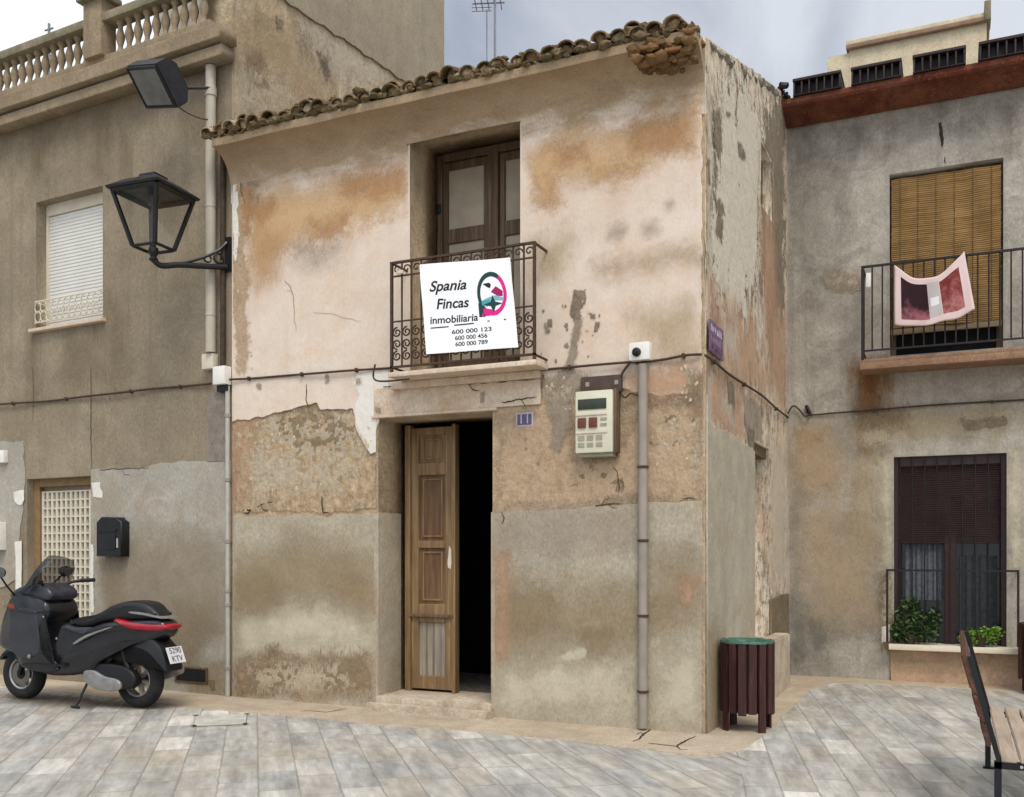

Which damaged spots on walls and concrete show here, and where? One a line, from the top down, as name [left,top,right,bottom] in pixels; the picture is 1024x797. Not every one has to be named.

leakage [528,113,697,206]
leakage [249,169,408,278]
crack [285,281,354,325]
spalling [494,64,791,513]
crack [463,379,534,409]
spalling [233,406,377,516]
crack [596,468,624,508]
leakage [238,598,376,661]